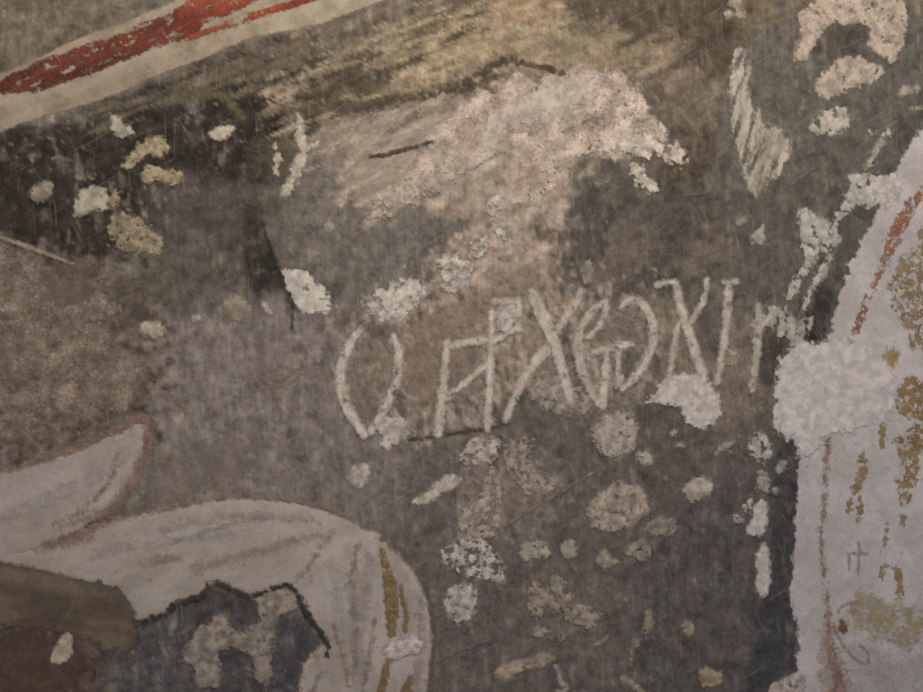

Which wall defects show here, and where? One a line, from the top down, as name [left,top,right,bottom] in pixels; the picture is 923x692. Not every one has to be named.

flaking render [793,0,908,136]
flaking render [110,115,183,185]
flaking render [209,125,235,141]
damp [246,95,462,215]
flaking render [73,174,163,257]
flaking render [281,269,331,315]
flaking render [645,372,722,430]
flaking render [590,407,653,466]
flaking render [412,474,463,505]
flaking render [682,476,713,503]
flaking render [440,436,558,626]
flaking render [585,480,679,571]